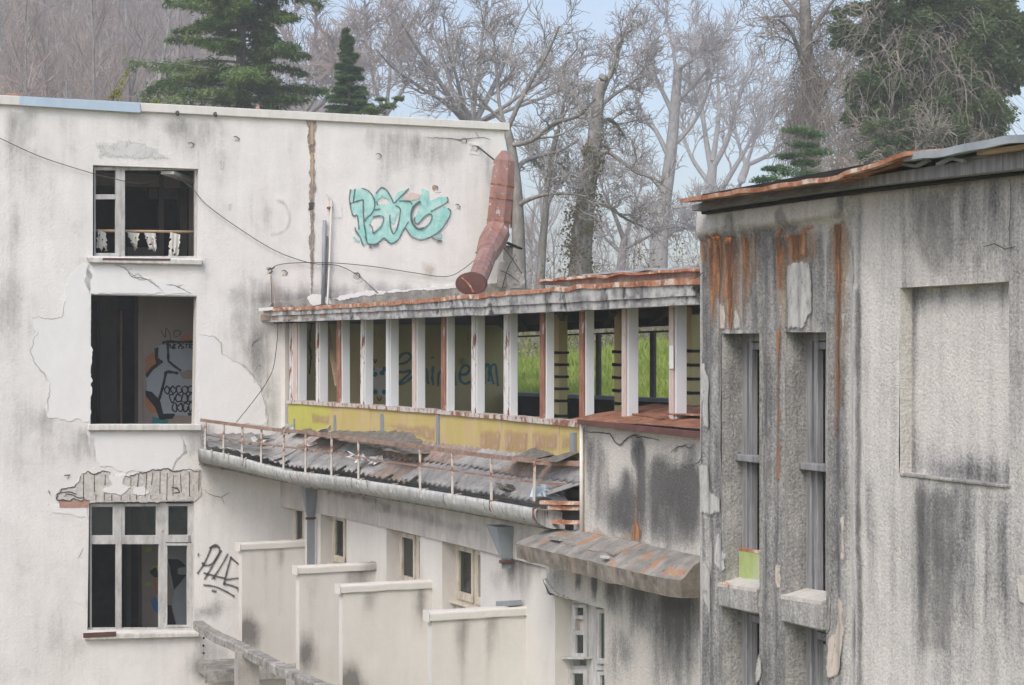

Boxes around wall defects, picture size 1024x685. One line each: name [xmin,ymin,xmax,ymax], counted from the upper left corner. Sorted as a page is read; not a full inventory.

rust [680,148,944,203]
rust [699,234,754,329]
rust [775,226,813,288]
peeling [787,261,812,328]
rust [832,221,847,427]
peeling [30,263,202,519]
crack [585,431,703,465]
peeling [820,587,854,678]